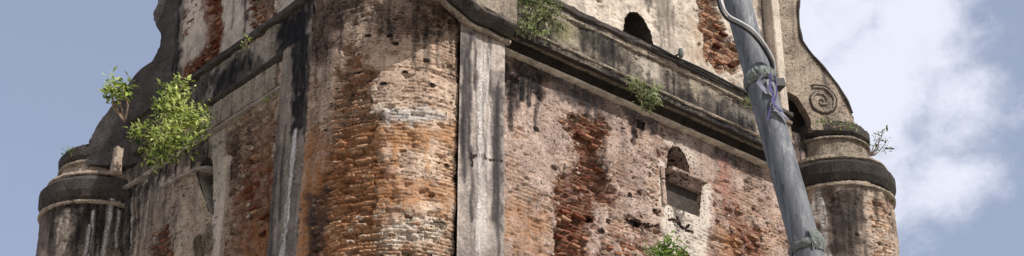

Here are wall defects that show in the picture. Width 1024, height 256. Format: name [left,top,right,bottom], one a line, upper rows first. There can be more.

spalling [181,0,223,77]
spalling [340,34,387,92]
spalling [693,0,740,84]
leakage [45,136,211,256]
spalling [241,141,275,256]
spalling [306,100,455,256]
leakage [450,30,602,256]
spalling [546,115,661,256]